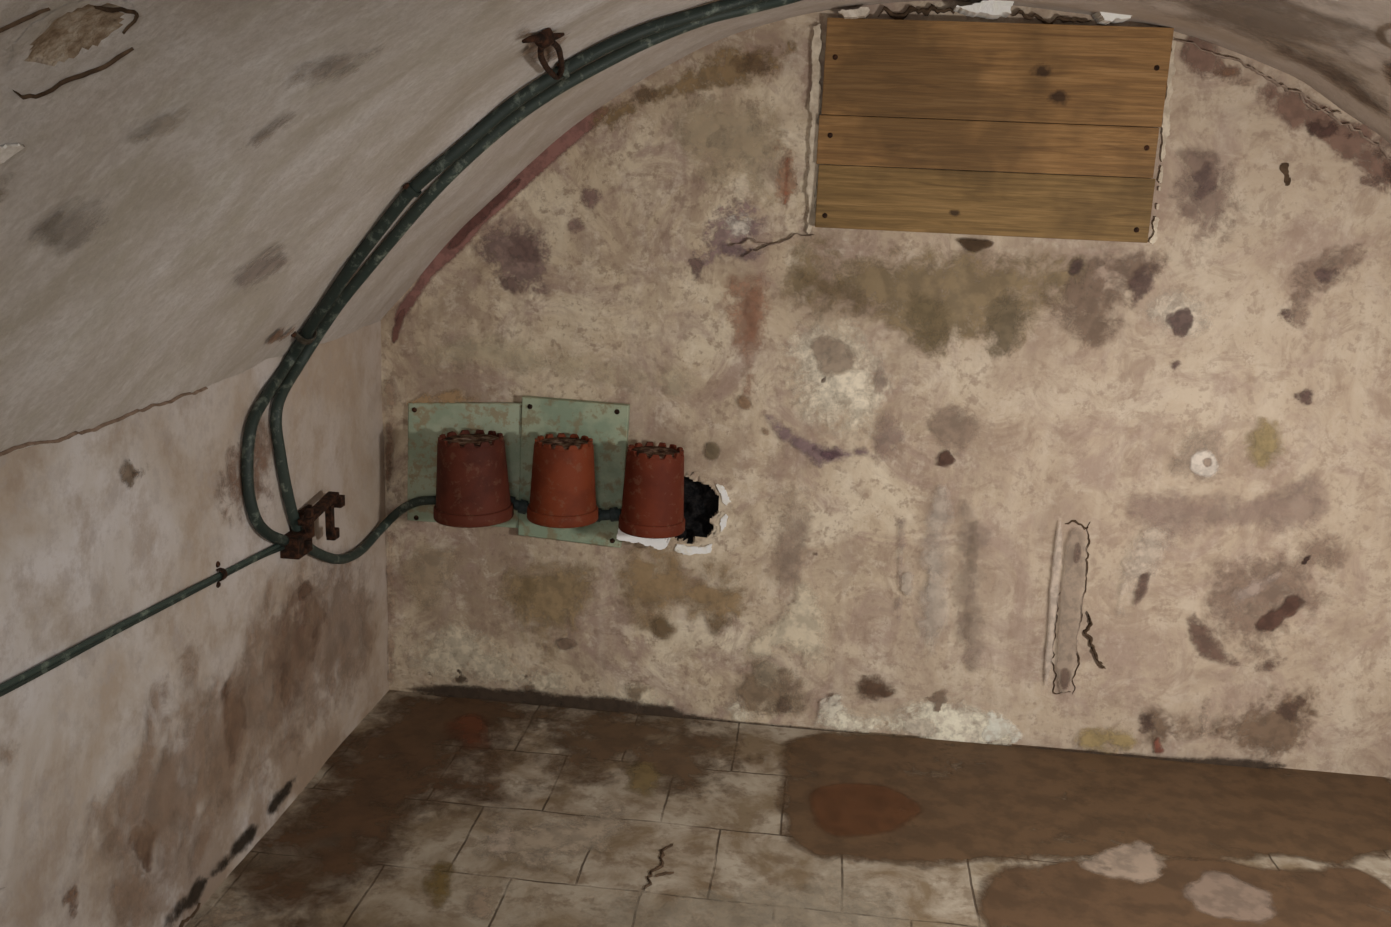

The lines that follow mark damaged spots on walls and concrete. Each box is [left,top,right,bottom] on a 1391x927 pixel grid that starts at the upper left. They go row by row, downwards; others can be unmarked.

crack [0,387,208,456]
leakage [107,487,1391,927]
leakage [64,886,78,914]